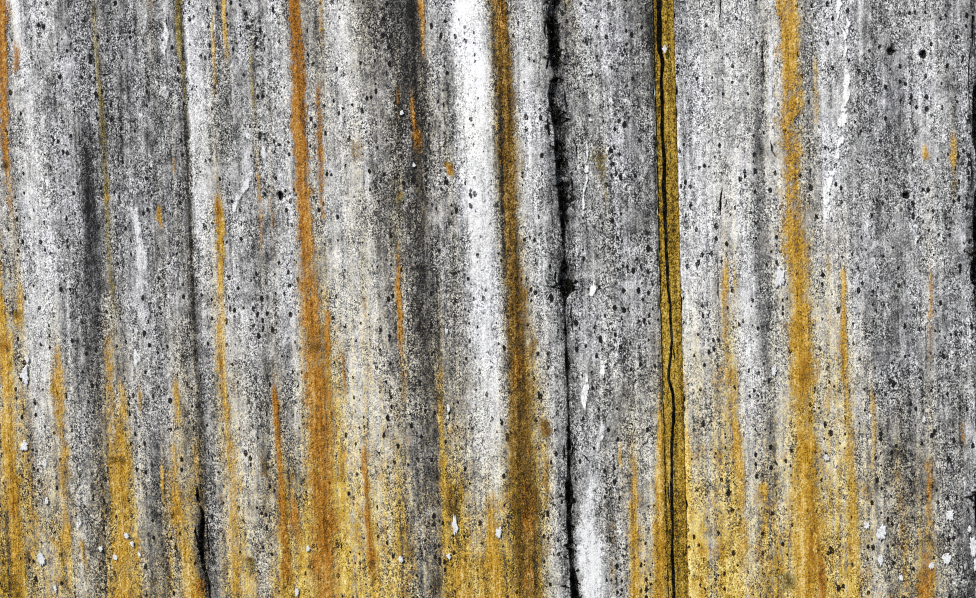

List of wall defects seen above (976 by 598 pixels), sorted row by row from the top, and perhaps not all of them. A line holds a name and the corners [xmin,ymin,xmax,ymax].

rust [0,0,20,210]
rust [0,265,87,598]
rust [105,343,142,598]
rust [160,442,206,598]
rust [259,0,347,598]
rust [450,0,552,598]
crack [536,0,590,598]
rust [652,409,668,598]
crack [656,0,676,598]
rust [763,0,826,598]
crack [959,11,976,308]
crack [964,491,976,534]